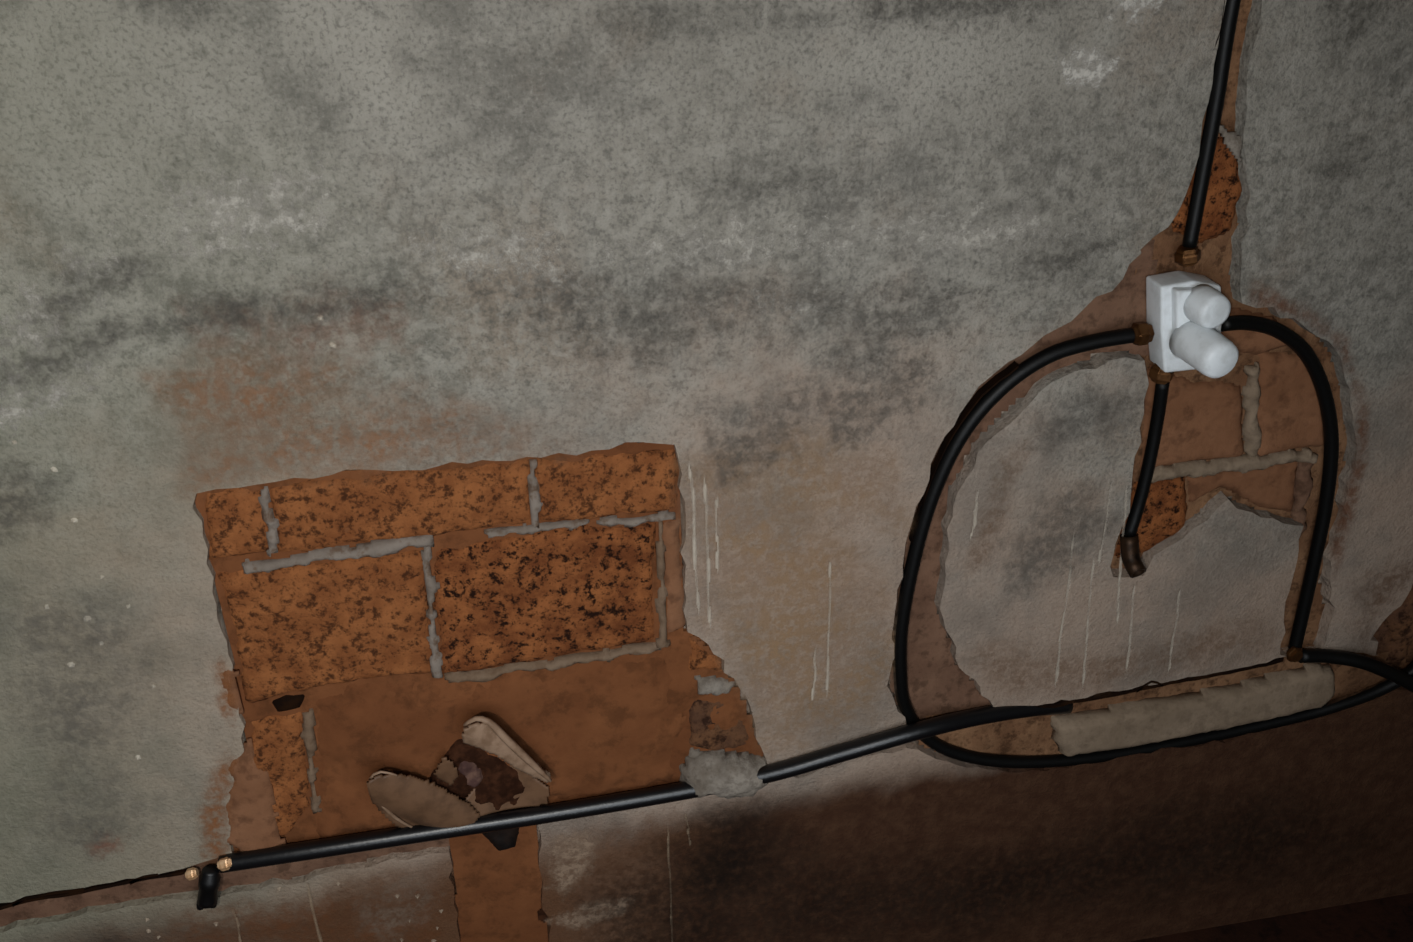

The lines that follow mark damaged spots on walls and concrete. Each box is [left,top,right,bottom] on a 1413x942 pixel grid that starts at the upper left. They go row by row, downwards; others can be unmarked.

water stain [1061,48,1120,89]
peeling [1219,124,1242,162]
water stain [169,161,328,255]
water stain [409,228,573,305]
water stain [629,199,1077,275]
flaking render [1110,223,1347,648]
flaking render [195,442,763,852]
flaking render [1373,585,1413,669]